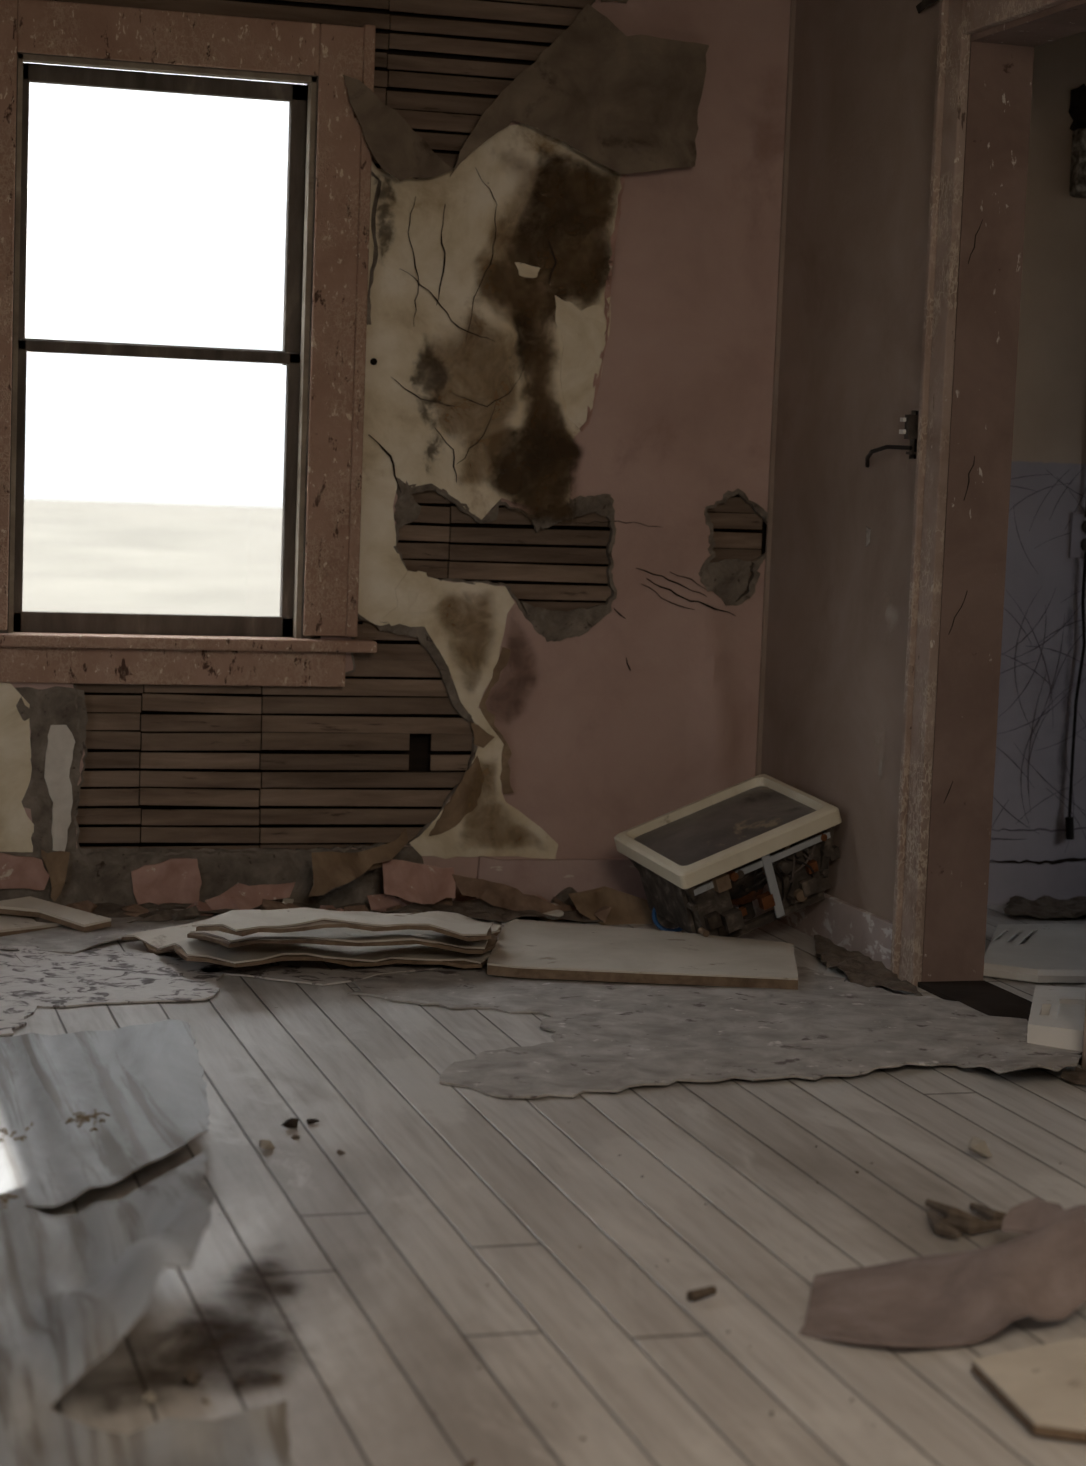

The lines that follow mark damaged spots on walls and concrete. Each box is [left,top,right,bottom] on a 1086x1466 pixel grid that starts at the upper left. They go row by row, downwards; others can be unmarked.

peeling [0,0,628,908]
water stain [378,178,394,246]
water stain [412,153,613,521]
flaking render [698,488,768,606]